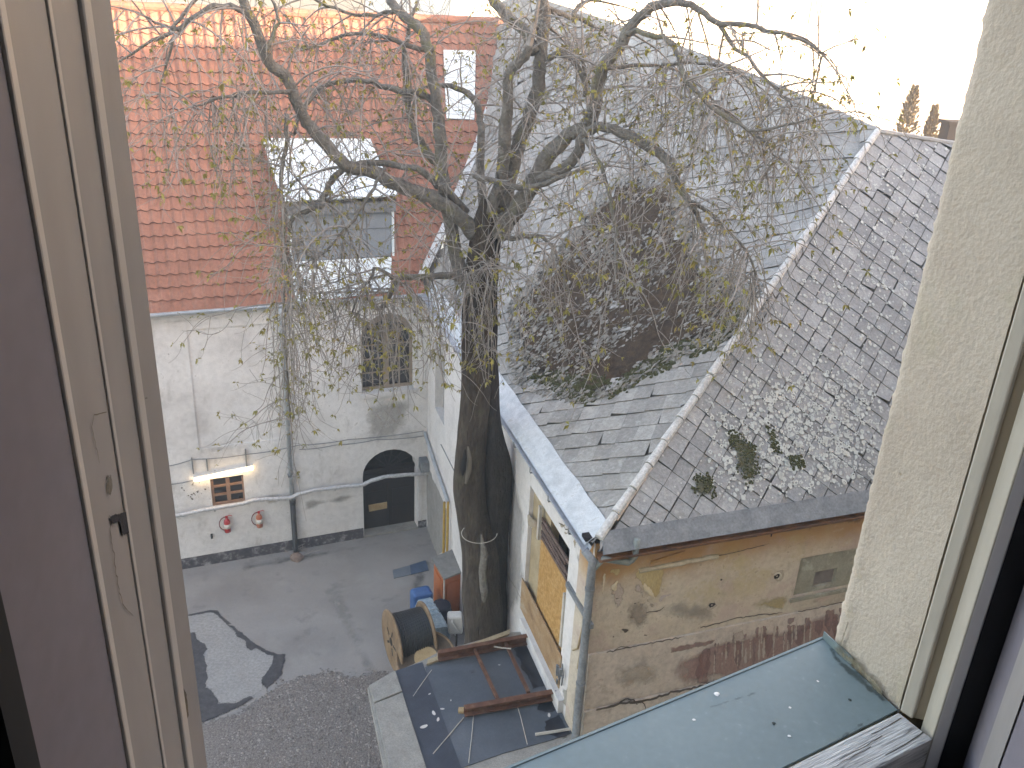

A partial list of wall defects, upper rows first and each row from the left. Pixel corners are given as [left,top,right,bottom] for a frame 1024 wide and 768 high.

peeling [602,569,671,637]
crack [607,602,848,653]
water stain [672,608,881,694]
crack [596,681,713,711]